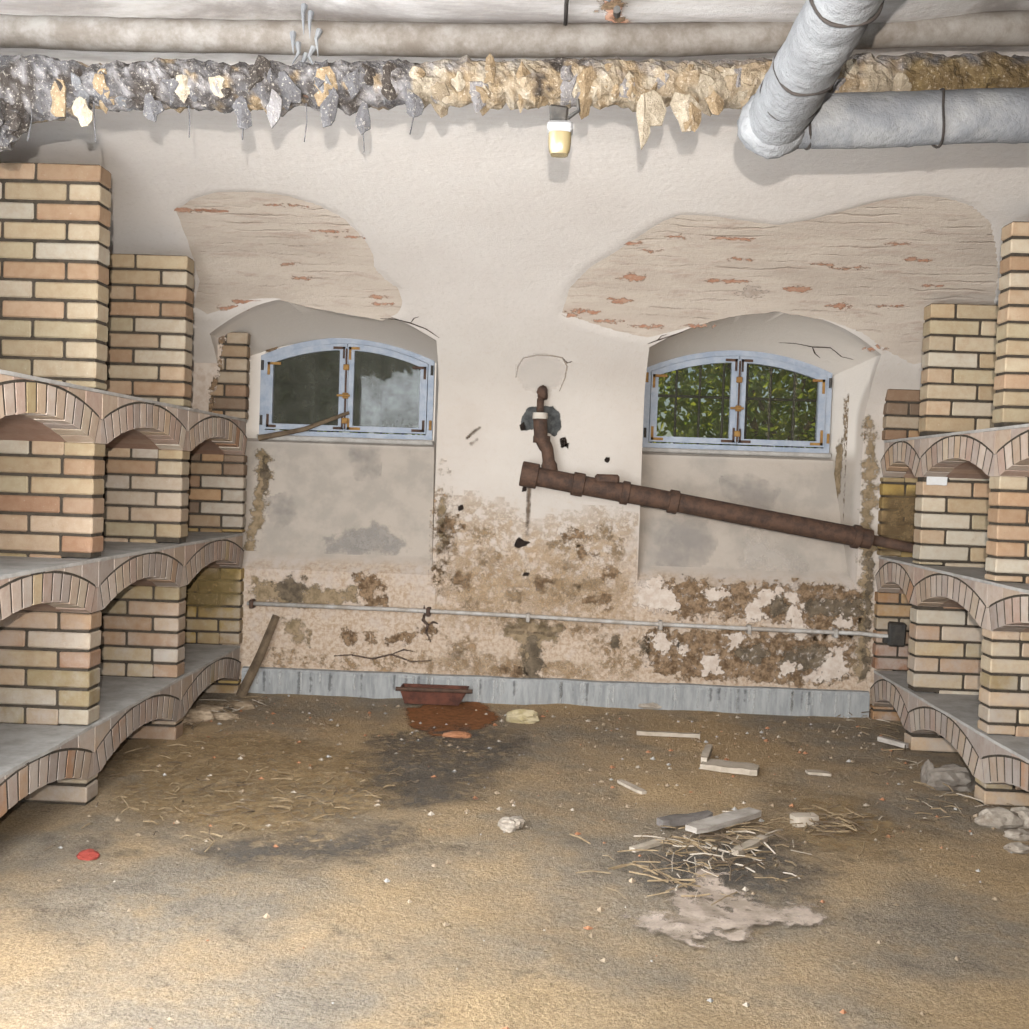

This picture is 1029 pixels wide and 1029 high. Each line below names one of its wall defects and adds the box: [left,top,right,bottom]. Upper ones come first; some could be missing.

peeling [50,68,197,127]
peeling [208,53,496,135]
peeling [516,61,757,150]
peeling [828,59,860,93]
peeling [893,72,912,91]
spalling [174,192,402,321]
spalling [562,196,998,364]
crack [788,343,850,359]
water stain [431,489,652,673]